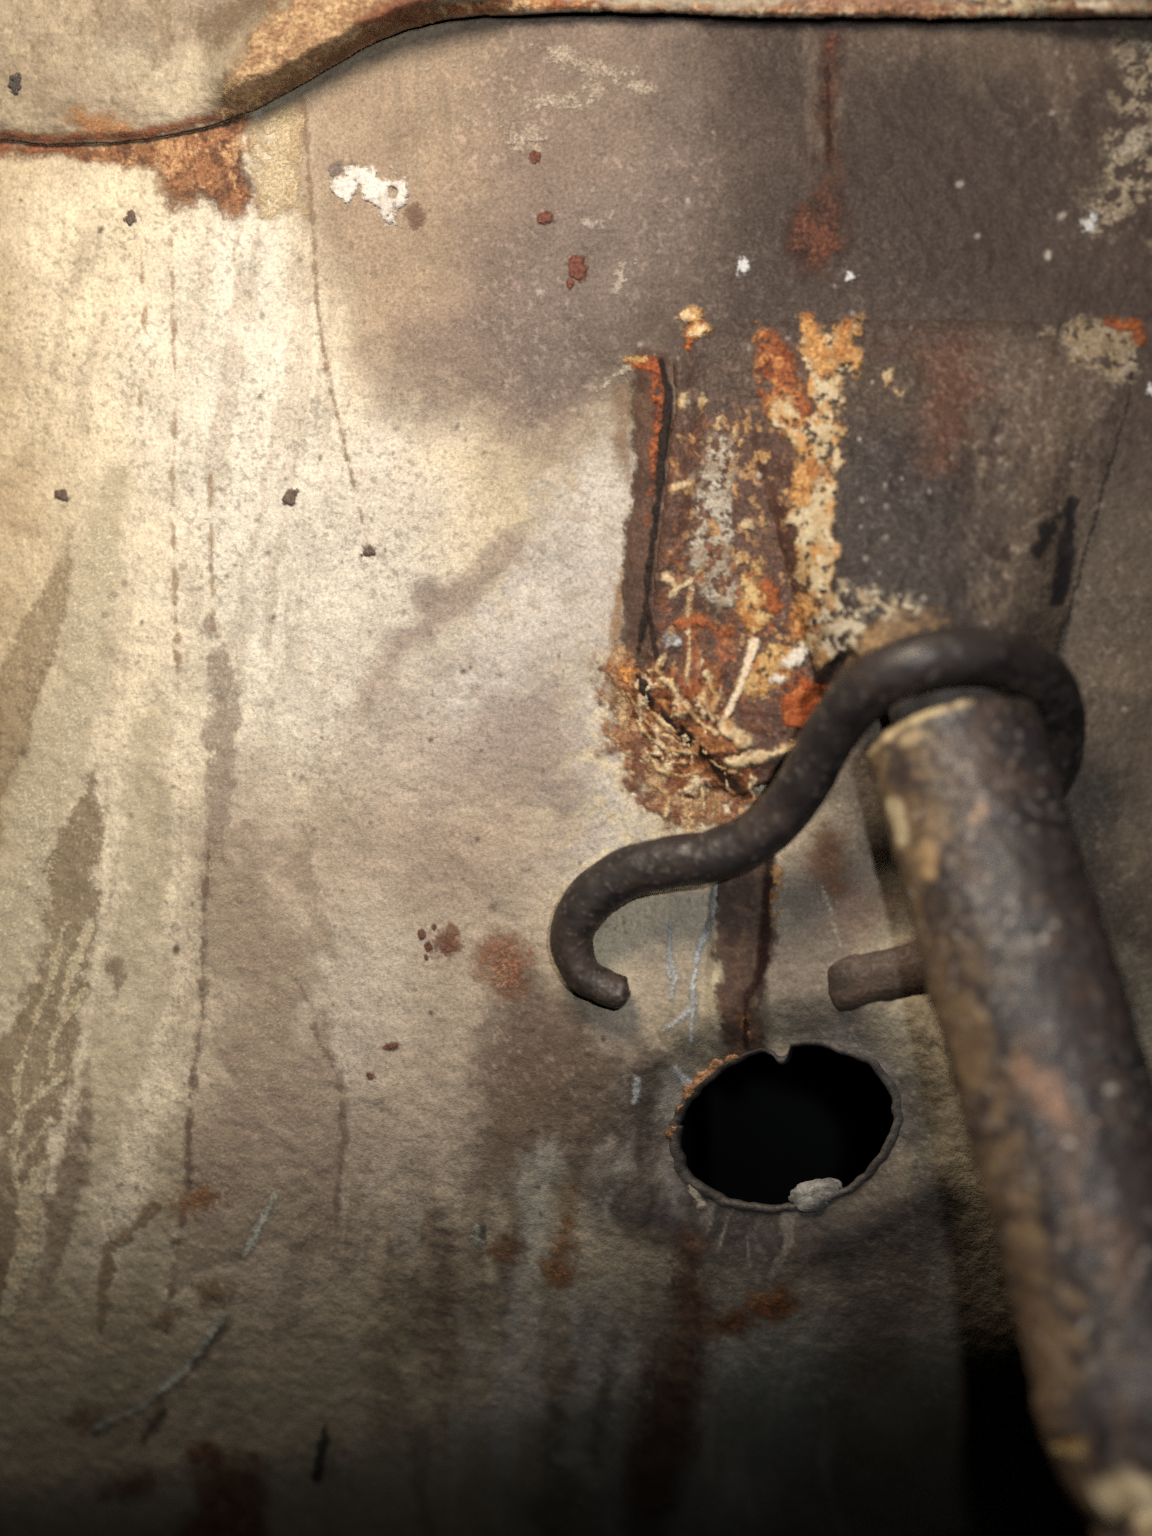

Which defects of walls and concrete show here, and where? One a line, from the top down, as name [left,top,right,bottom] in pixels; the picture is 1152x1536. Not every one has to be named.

corrosion [0,110,253,219]
corrosion [529,151,541,163]
corrosion [591,0,1152,271]
leakage [301,105,329,369]
corrosion [622,356,648,365]
corrosion [752,320,812,429]
corrosion [663,612,734,637]
corrosion [591,645,746,833]
corrosion [780,678,829,729]
leakage [0,467,348,1490]
corrosion [665,856,784,1139]